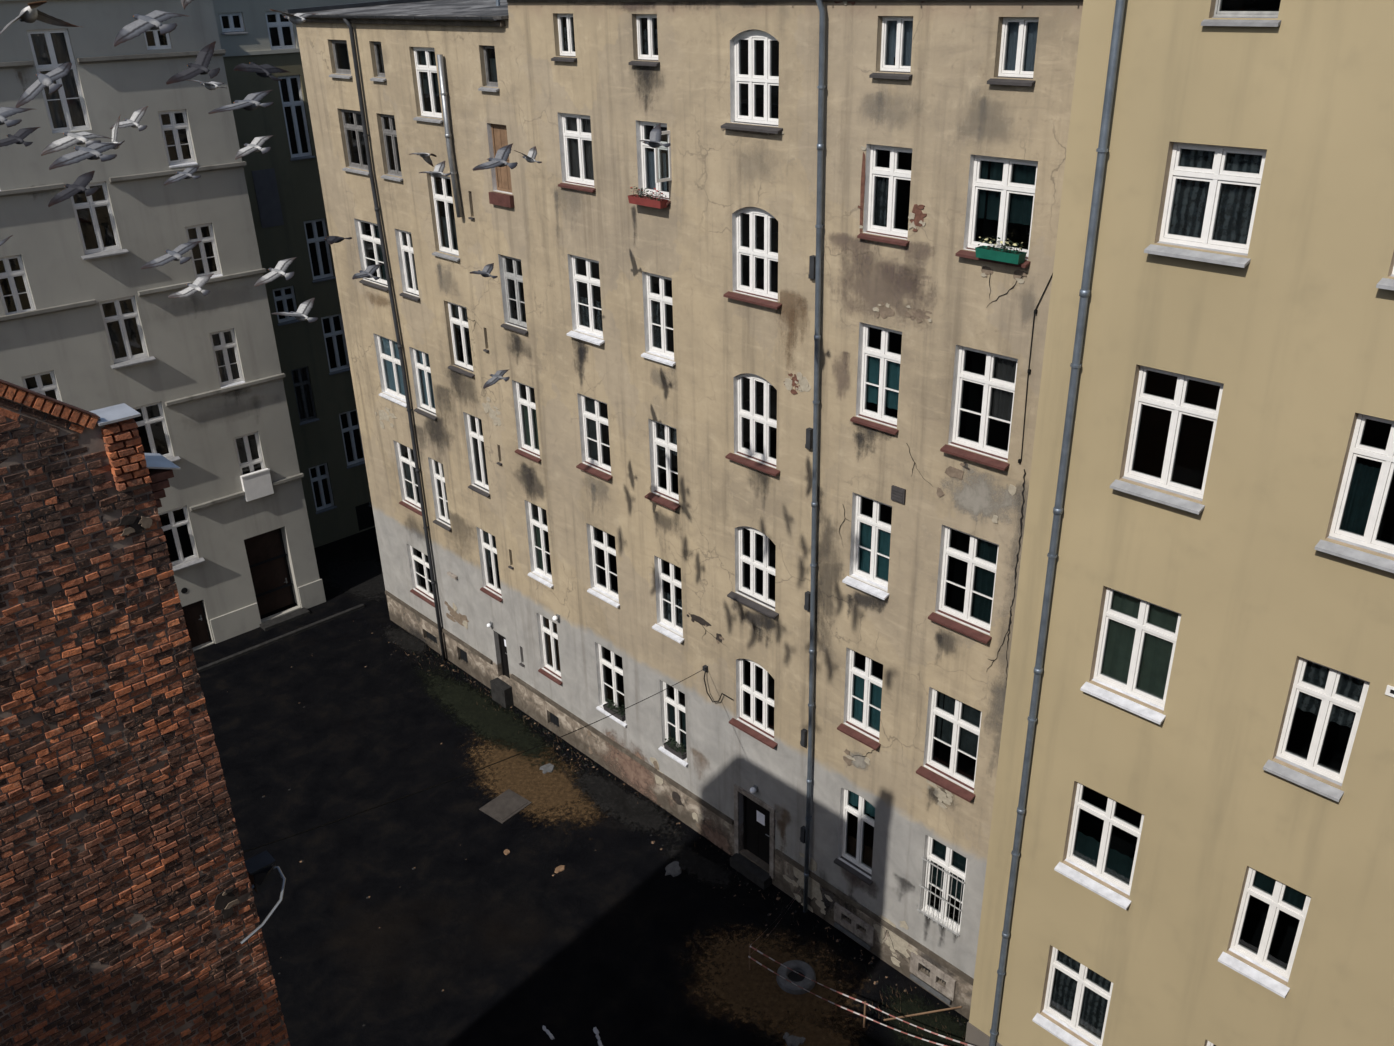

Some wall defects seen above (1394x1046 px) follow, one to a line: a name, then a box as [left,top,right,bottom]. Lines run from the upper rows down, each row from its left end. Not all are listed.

spalling [908,204,927,232]
crack [986,273,1023,308]
peeling [936,462,970,497]
crack [989,469,1026,688]
flaking render [873,915,918,967]